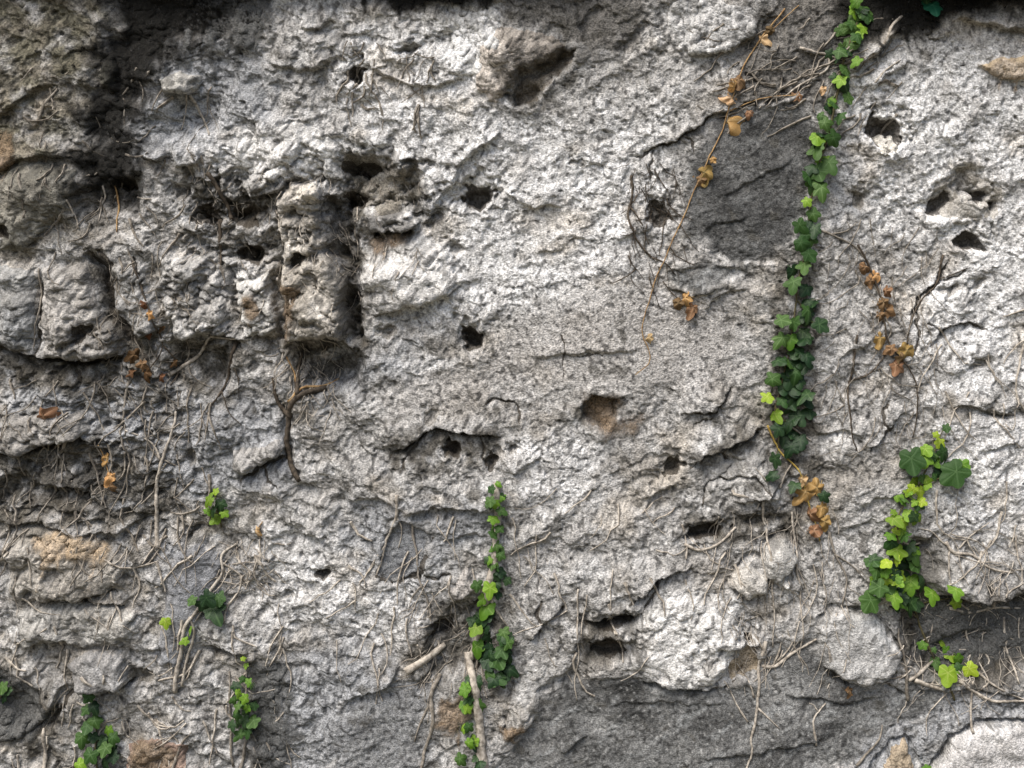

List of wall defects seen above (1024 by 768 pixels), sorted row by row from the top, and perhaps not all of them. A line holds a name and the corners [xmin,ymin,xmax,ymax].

crack [636,113,715,183]